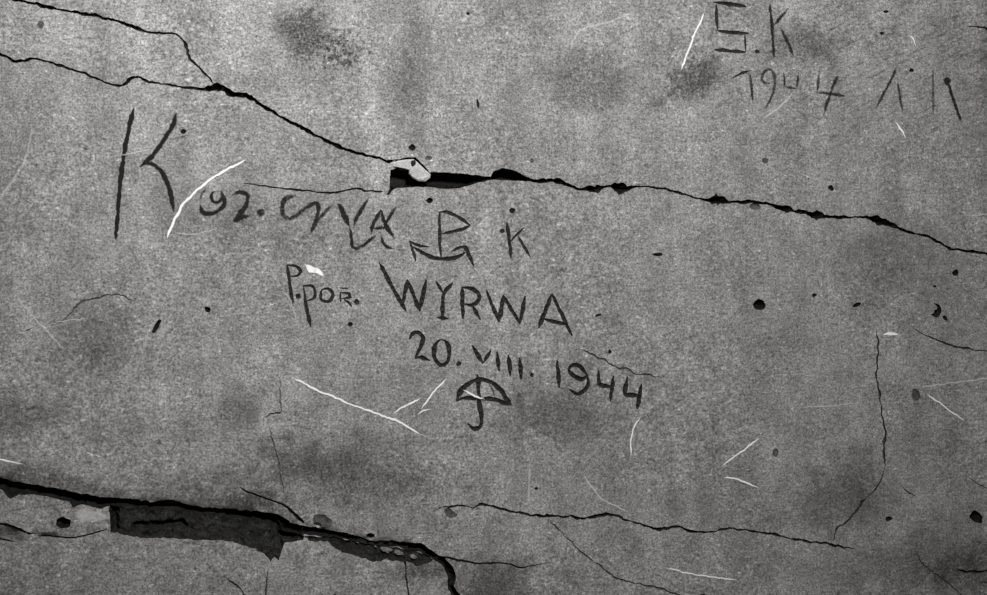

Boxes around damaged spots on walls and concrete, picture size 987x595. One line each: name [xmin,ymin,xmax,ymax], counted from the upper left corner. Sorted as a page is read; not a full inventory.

crack [0,0,987,255]
flaking render [393,144,432,182]
crack [24,294,133,331]
crack [0,477,134,542]
flaking render [109,499,433,566]
crack [240,381,551,595]
crack [433,328,916,595]
crack [224,570,268,595]
crack [916,554,987,595]